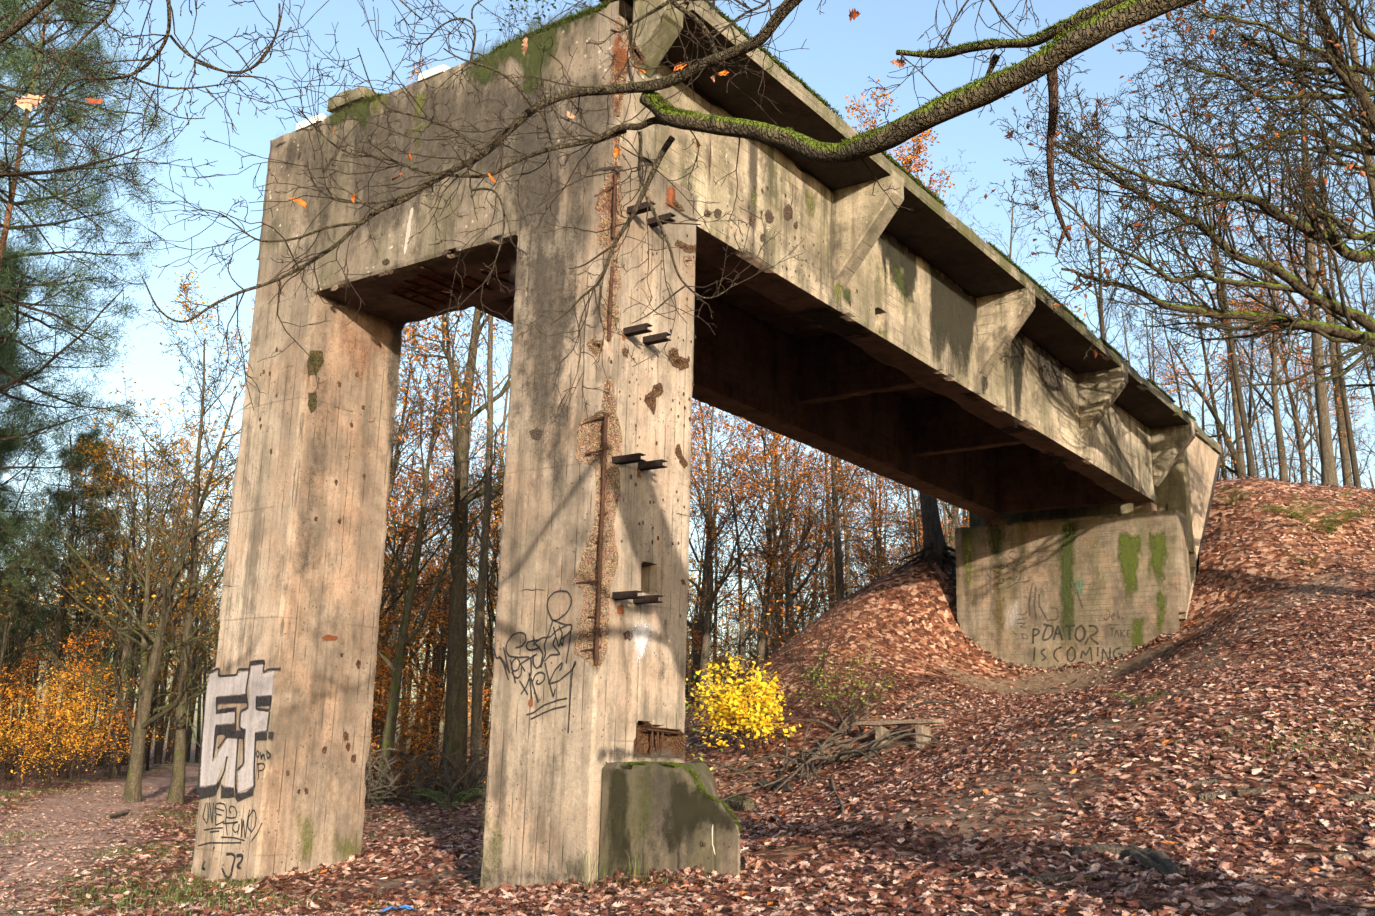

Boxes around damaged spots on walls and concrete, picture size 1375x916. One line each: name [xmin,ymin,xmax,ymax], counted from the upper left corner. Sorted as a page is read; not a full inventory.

damp [878,229,988,401]
spalling [571,136,696,669]
damp [598,747,713,868]